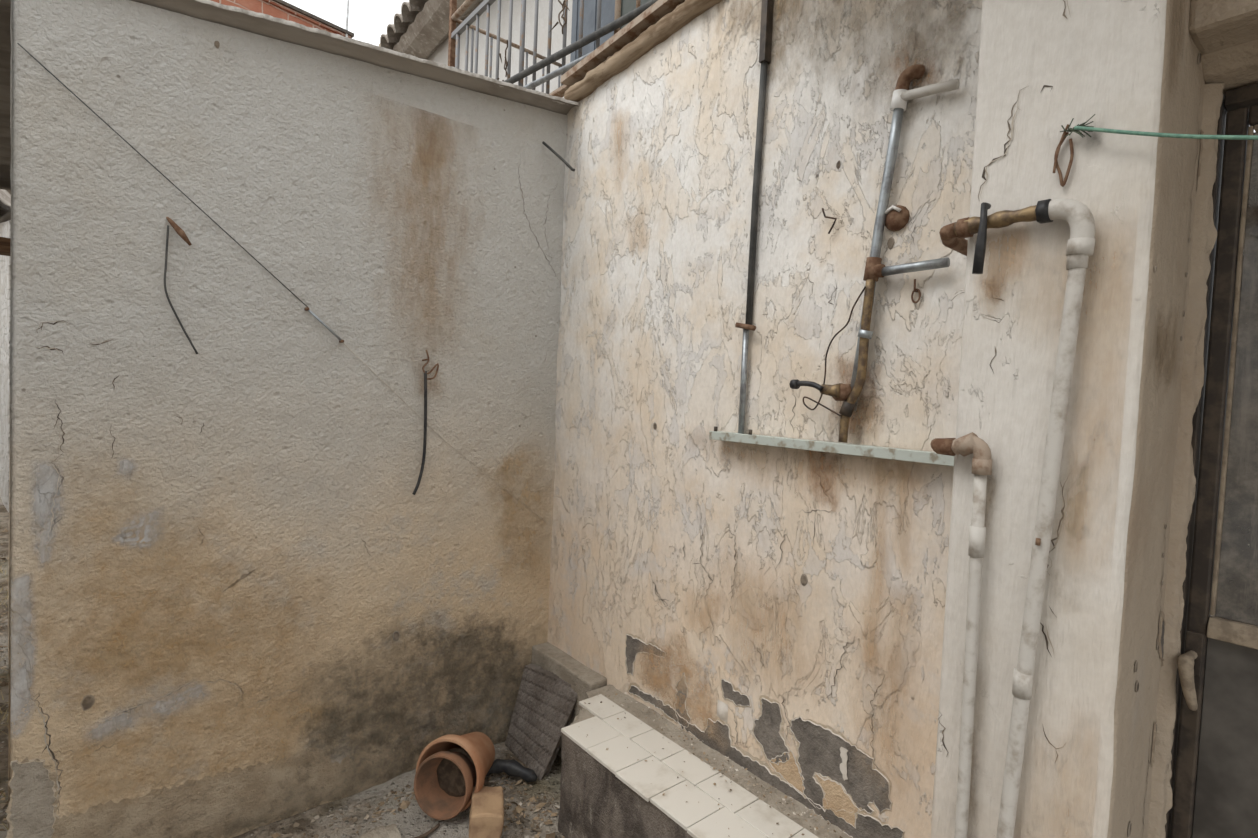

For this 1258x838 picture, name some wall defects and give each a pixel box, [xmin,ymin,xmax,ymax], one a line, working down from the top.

crack [978,85,1053,199]
crack [775,469,834,569]
crack [683,522,738,639]
crack [827,637,855,699]
spalling [625,633,905,838]